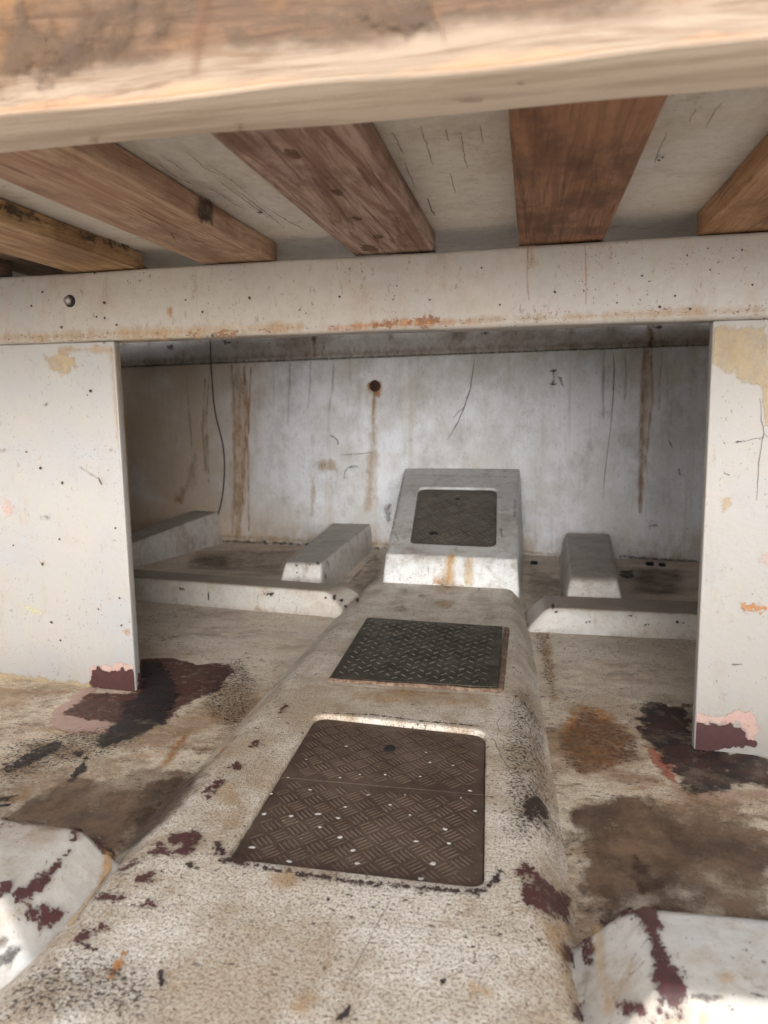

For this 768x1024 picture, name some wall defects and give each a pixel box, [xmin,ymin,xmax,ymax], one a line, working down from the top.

crack [449,359,475,437]
crack [744,402,768,495]
peeling [0,658,259,828]
rust [561,707,639,773]
peeling [630,702,768,798]
water stain [7,766,207,851]
peeling [0,689,721,1024]
water stain [566,795,768,925]